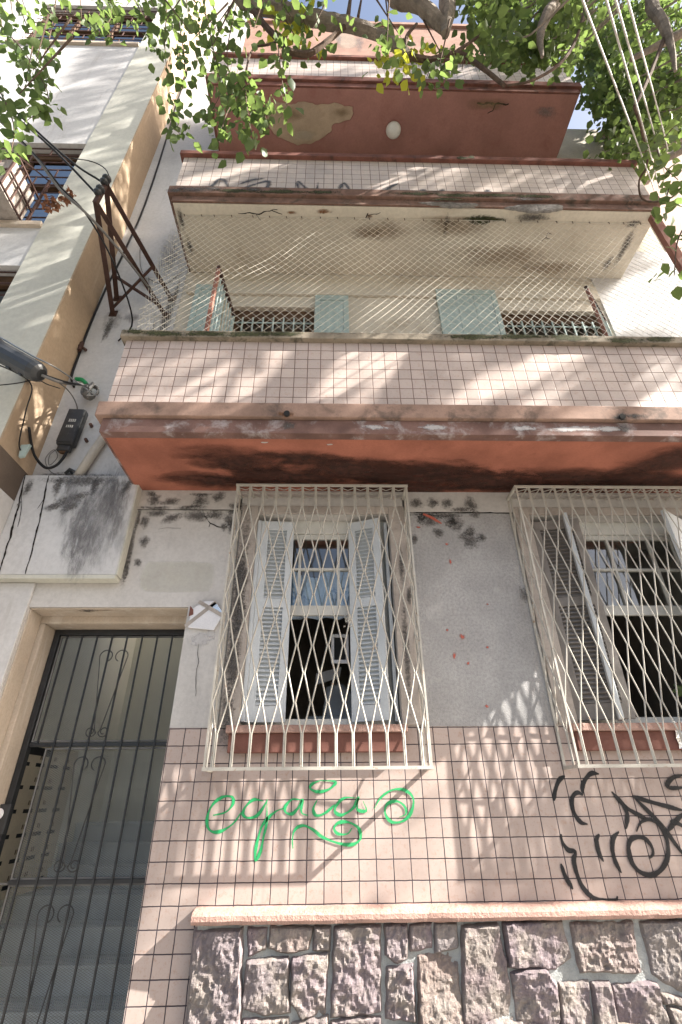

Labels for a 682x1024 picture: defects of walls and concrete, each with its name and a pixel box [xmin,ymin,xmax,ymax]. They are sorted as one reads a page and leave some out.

peeling [266,101,354,146]
crack [477,102,509,113]
crack [238,209,281,218]
crack [0,476,49,574]
damp [46,473,131,530]
damp [136,448,682,738]